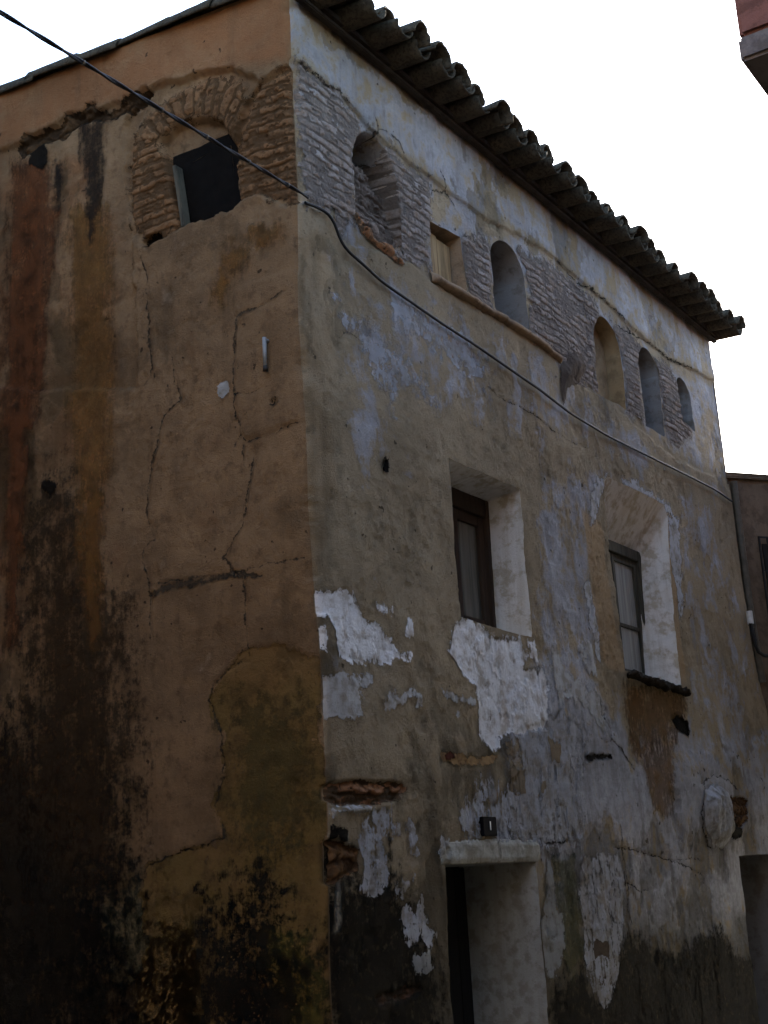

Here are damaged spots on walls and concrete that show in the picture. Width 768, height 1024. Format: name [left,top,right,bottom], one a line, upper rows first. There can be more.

leakage [78,120,105,245]
flaking render [18,55,434,272]
leakage [0,159,153,1024]
crack [140,255,305,865]
peeling [102,587,438,1024]
peeling [440,581,625,1009]
peeling [621,478,684,619]
leakage [548,854,760,1024]